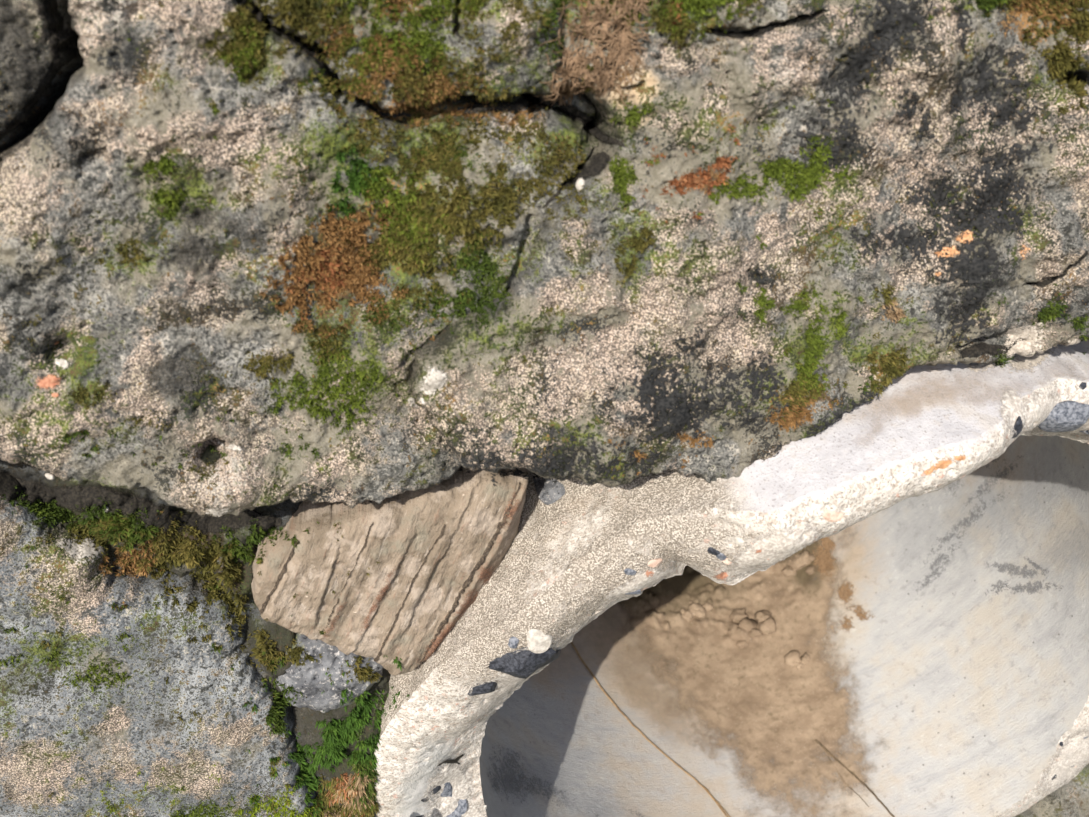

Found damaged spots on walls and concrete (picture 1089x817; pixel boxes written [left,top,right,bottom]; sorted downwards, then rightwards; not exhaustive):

crack [452,3,460,35]
crack [709,11,824,37]
crack [0,0,61,140]